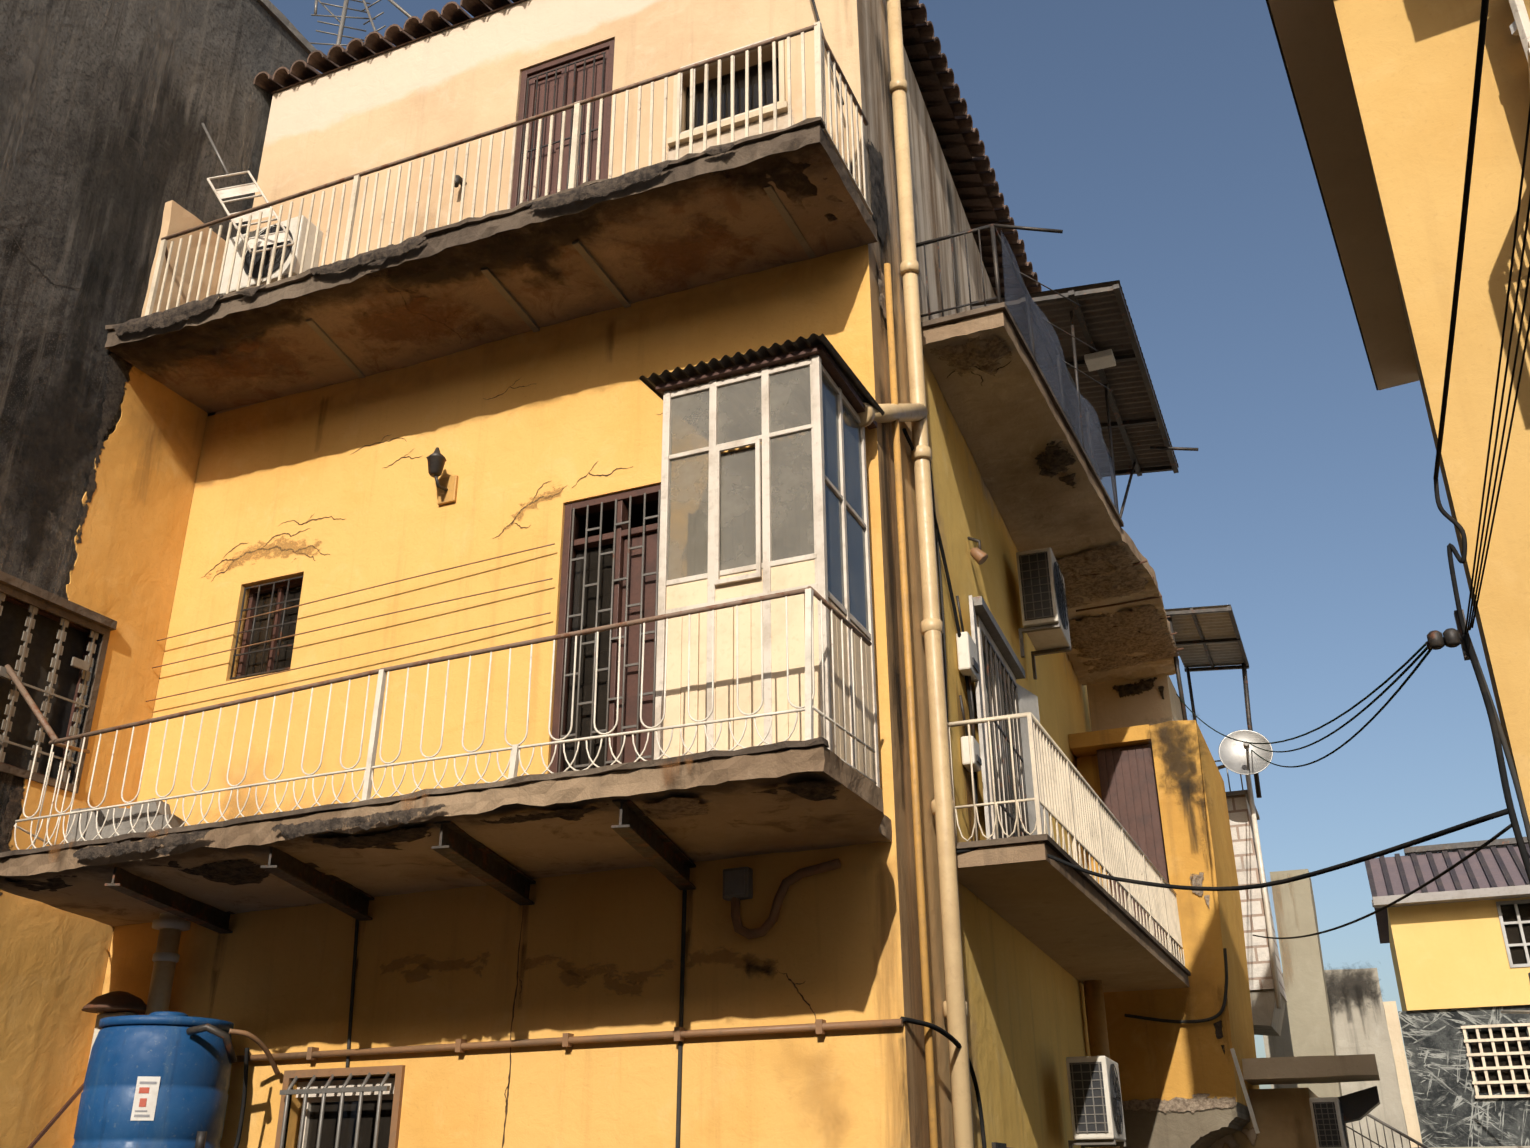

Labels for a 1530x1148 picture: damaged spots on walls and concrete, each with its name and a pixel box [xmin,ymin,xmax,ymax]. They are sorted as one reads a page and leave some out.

leakage [370,216,602,291]
leakage [0,0,205,590]
leakage [117,307,301,375]
crack [350,435,421,468]
crack [492,462,633,539]
crack [204,514,344,582]
spalling [1068,605,1181,700]
leakage [1151,719,1211,857]
spalling [0,829,270,896]
spalling [271,804,445,850]
crack [502,917,523,1148]
flaking render [1122,1093,1236,1113]